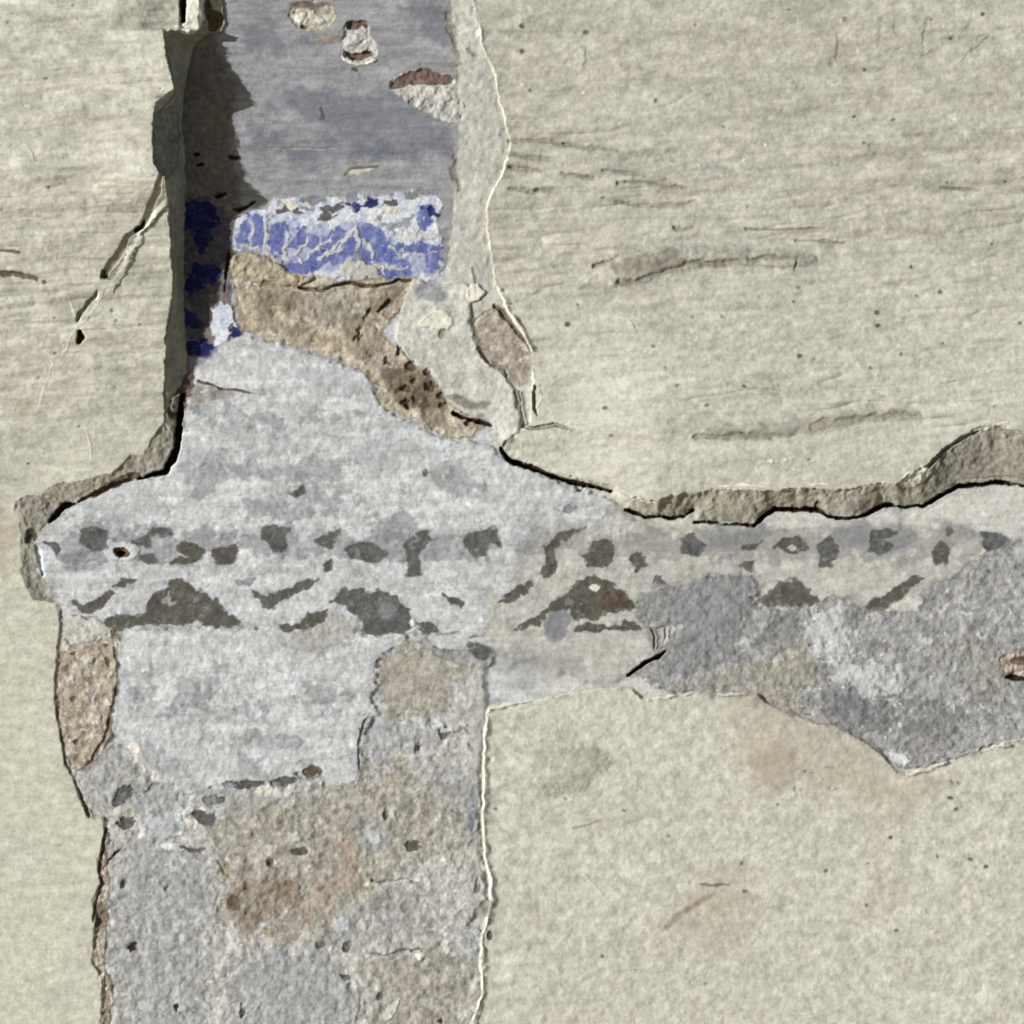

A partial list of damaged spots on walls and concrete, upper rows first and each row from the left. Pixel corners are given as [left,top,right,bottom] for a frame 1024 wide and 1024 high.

crack [37,171,169,409]
peeling [152,0,492,443]
crack [49,394,185,523]
crack [500,385,1024,527]
spalling [15,197,1024,1024]
crack [627,627,667,677]